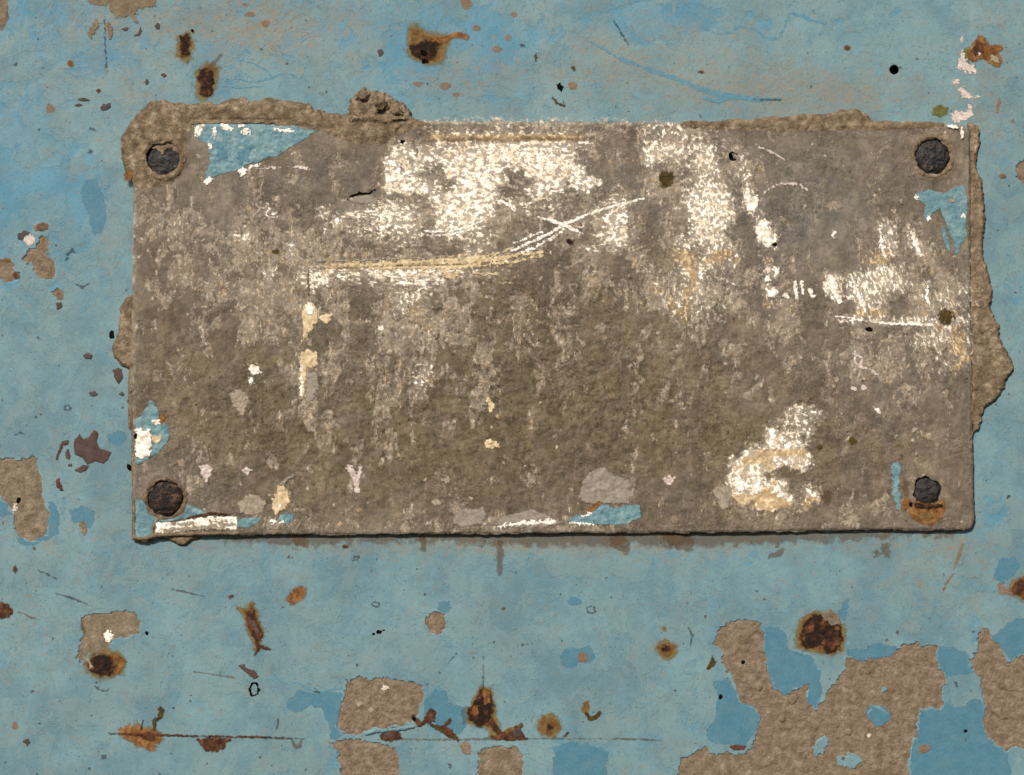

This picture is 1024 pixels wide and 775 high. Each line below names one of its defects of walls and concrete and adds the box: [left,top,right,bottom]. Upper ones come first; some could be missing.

corrosion [176,29,220,100]
corrosion [407,24,469,65]
corrosion [964,35,1003,67]
peeling [194,123,251,149]
peeling [237,163,310,177]
peeling [0,456,95,545]
peeling [76,610,149,663]
corrosion [795,609,846,655]
corrosion [83,650,126,678]
peeling [287,676,524,775]
corrosion [465,686,527,741]
peeling [678,618,1024,775]